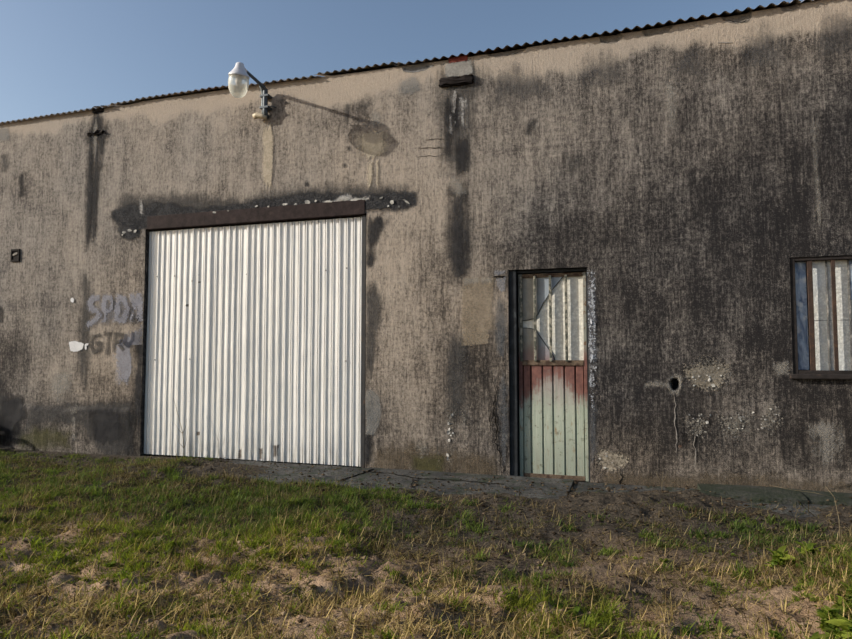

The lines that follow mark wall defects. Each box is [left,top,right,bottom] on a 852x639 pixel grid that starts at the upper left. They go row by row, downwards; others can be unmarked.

damp [439,67,483,174]
damp [84,114,107,246]
damp [111,122,417,267]
damp [445,183,470,280]
damp [78,274,90,392]
damp [365,283,380,376]
flaking render [678,354,734,392]
crack [337,378,504,485]
flaking render [596,447,629,474]
crack [674,398,696,465]